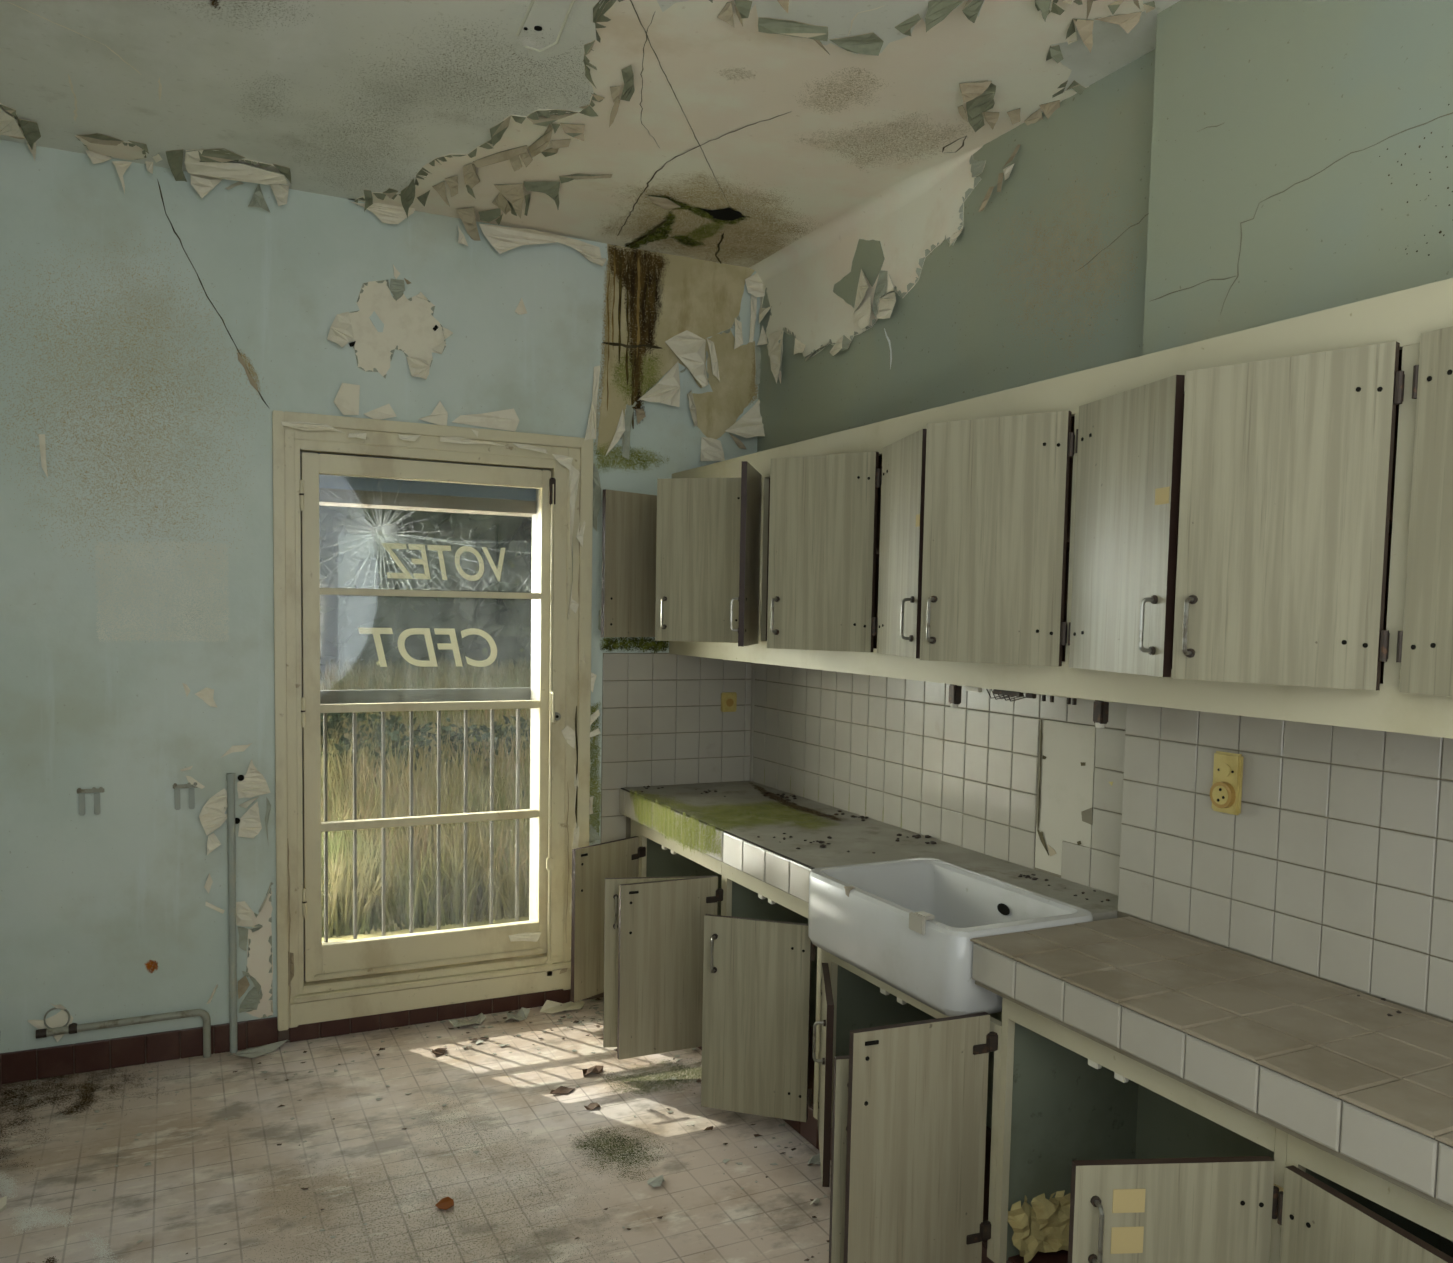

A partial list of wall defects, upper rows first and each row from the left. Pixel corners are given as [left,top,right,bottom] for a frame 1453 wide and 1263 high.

peeling [0,104,41,161]
peeling [75,133,291,213]
crack [157,179,269,408]
peeling [327,265,453,439]
leakage [581,171,822,473]
crack [617,0,792,236]
peeling [348,0,1155,384]
crack [1151,112,1453,315]
peeling [186,743,271,855]
peeling [1035,719,1096,875]
peeling [205,881,294,1018]